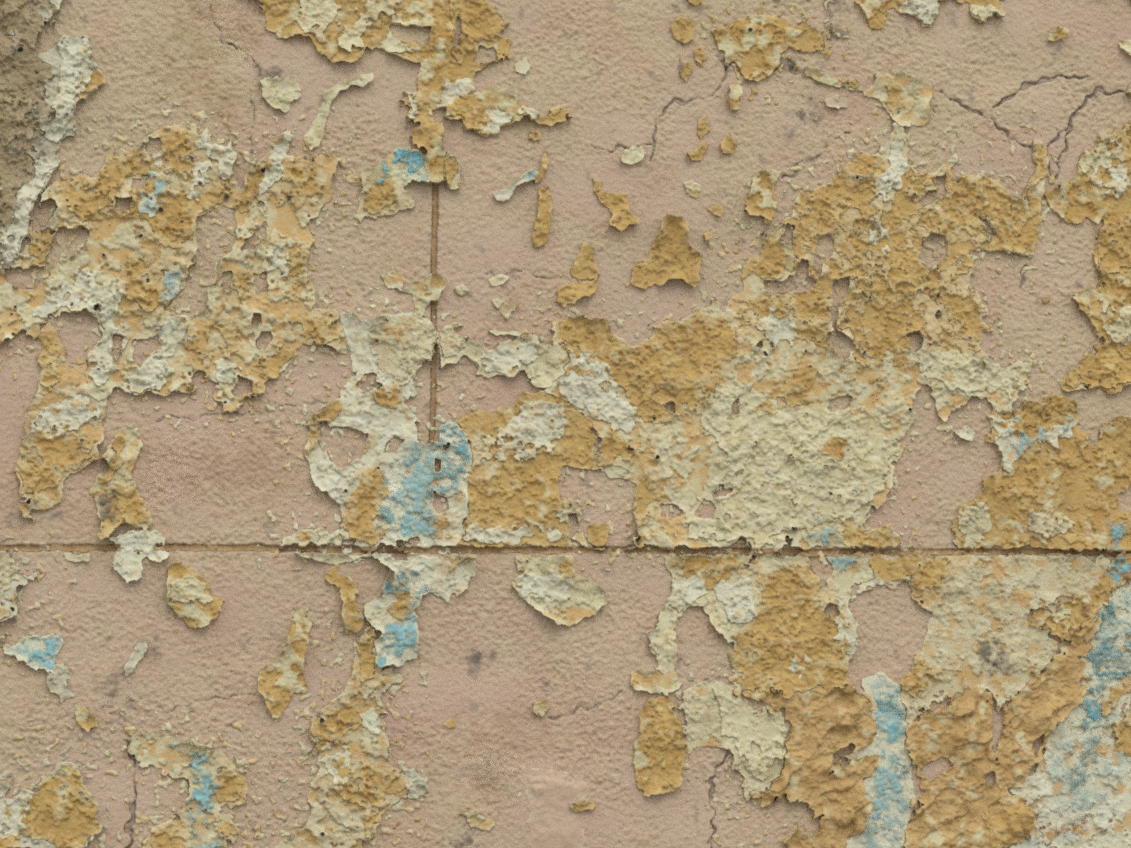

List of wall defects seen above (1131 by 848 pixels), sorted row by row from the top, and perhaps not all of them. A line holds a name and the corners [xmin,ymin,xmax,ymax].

peeling [854,0,941,29]
peeling [955,0,1007,24]
peeling [259,75,301,123]
crack [941,75,1124,179]
crack [782,155,820,178]
peeling [493,150,553,256]
crack [159,400,328,421]
peeling [166,561,225,628]
peeling [3,634,75,703]
peeling [0,764,104,848]
peeling [120,711,275,848]
crack [709,750,732,848]